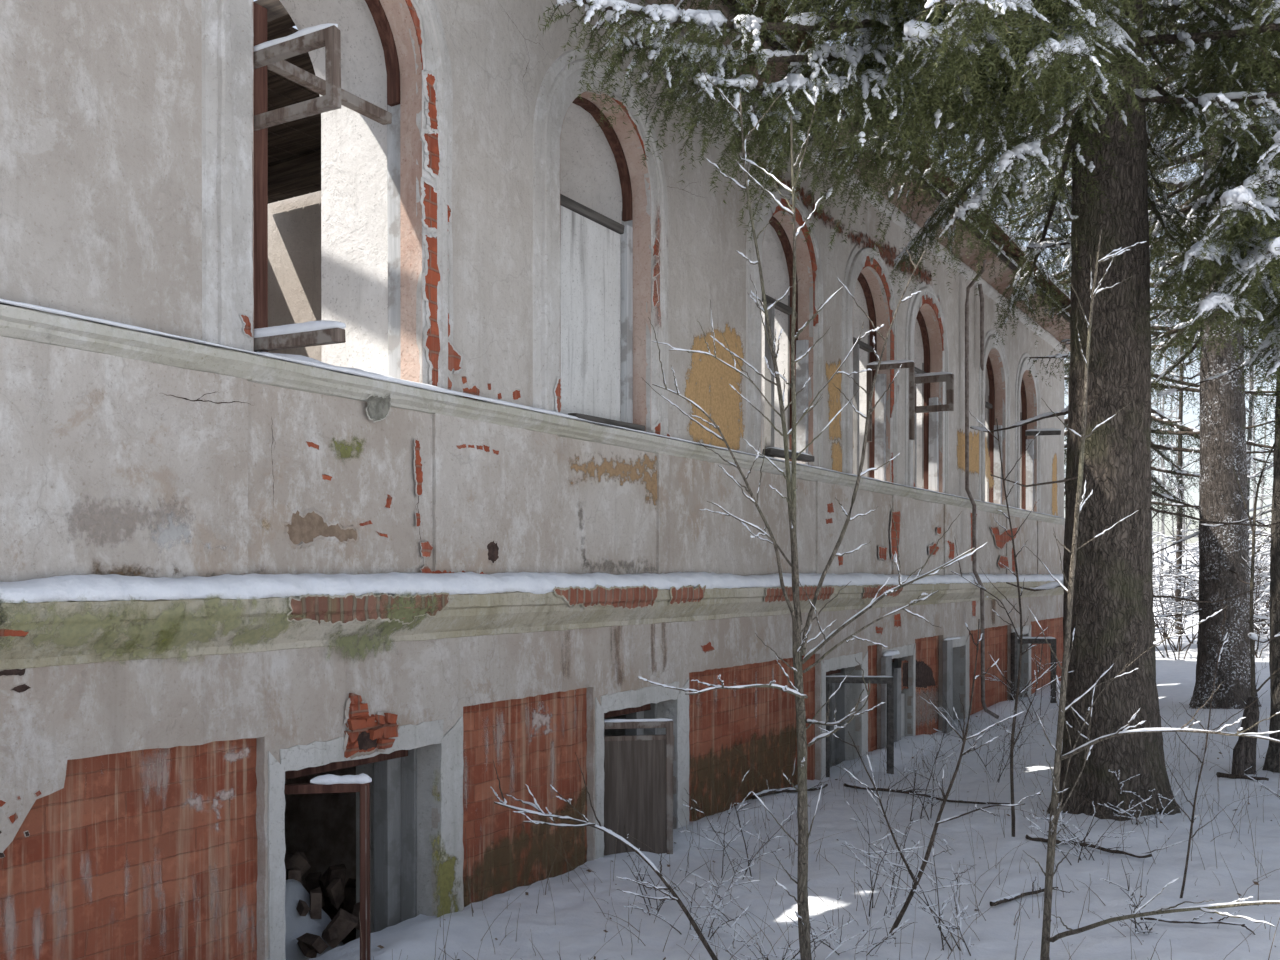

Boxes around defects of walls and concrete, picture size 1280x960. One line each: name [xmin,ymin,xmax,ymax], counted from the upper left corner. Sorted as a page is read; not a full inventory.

spalling [405,0,521,401]
peeling [685,324,745,450]
spalling [651,419,671,439]
crack [165,392,276,516]
spalling [283,506,388,550]
spalling [420,538,500,574]
flaking render [287,592,449,626]
flaking render [553,584,706,611]
spalling [343,693,400,759]
leakage [689,725,798,821]
spalling [0,789,42,837]